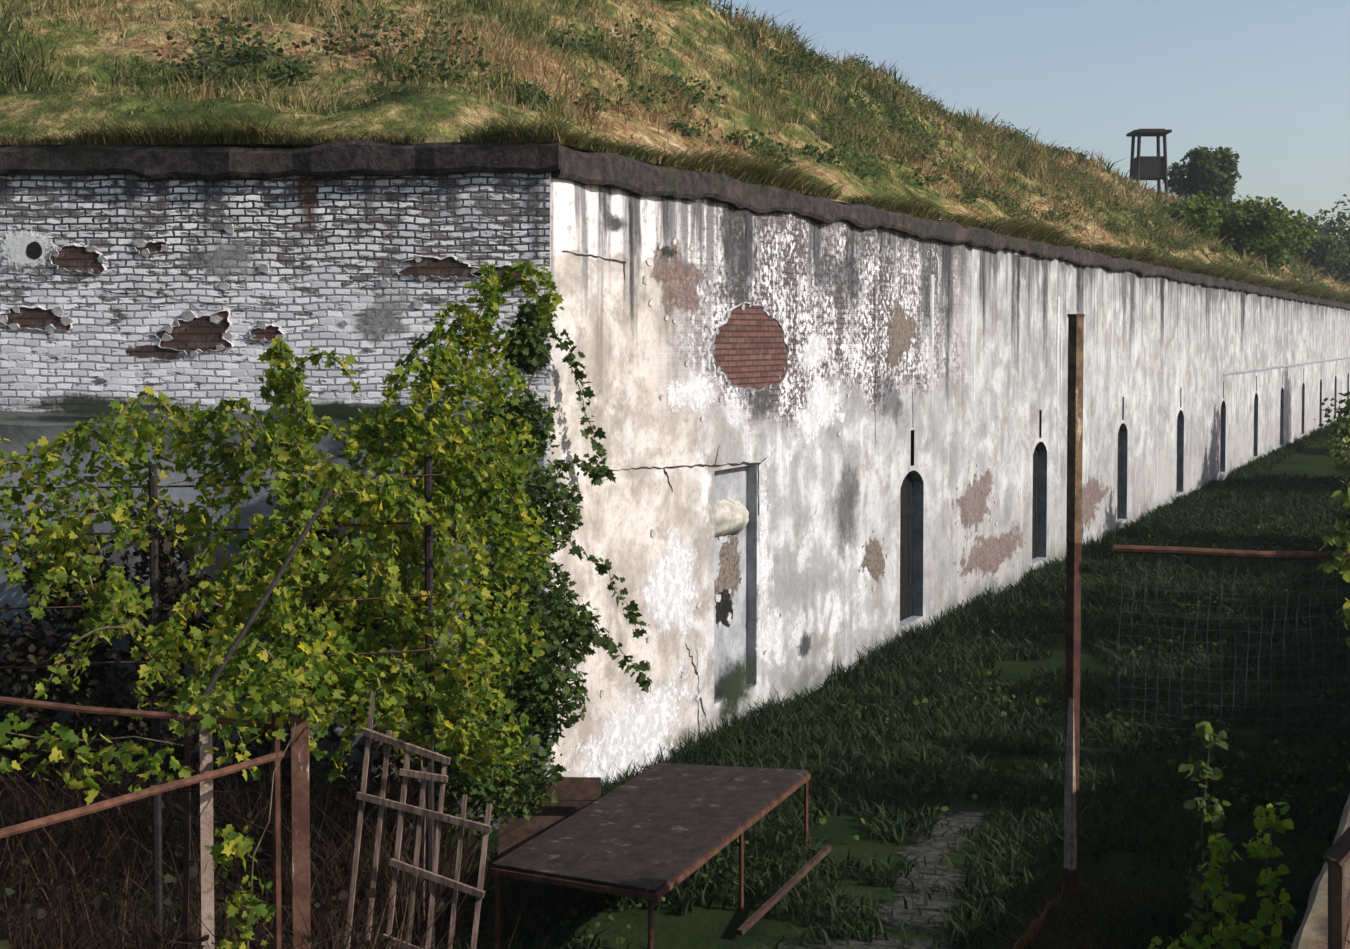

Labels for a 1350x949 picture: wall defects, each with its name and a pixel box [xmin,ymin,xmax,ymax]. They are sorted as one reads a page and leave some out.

spalling [0,305,74,334]
spalling [126,309,286,359]
crack [562,251,626,276]
leakage [600,185,641,269]
leakage [721,206,756,300]
flaking render [660,302,850,444]
leakage [921,243,953,354]
leakage [971,249,988,364]
leakage [1042,259,1062,375]
crack [610,448,767,515]
peeling [642,469,783,658]
flaking render [859,530,889,591]